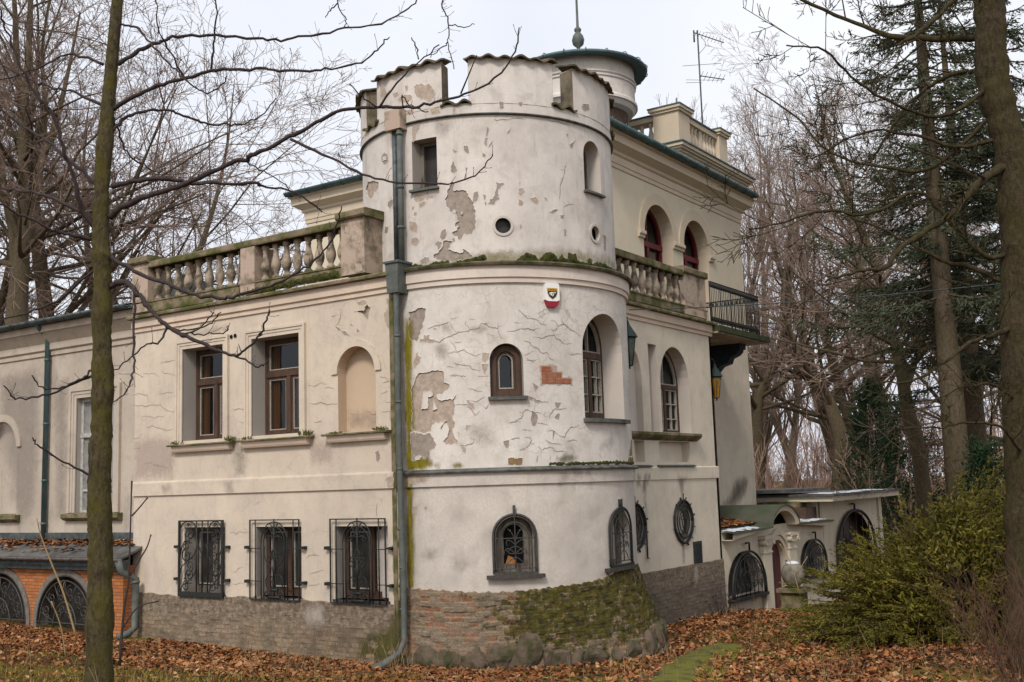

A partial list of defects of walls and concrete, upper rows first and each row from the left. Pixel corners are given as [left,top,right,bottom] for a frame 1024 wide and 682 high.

flaking render [380,83,456,142]
flaking render [366,180,379,199]
flaking render [409,127,504,265]
flaking render [335,299,371,336]
flaking render [408,307,475,461]
crack [421,309,580,446]
crack [507,395,577,463]
flaking render [528,364,573,426]